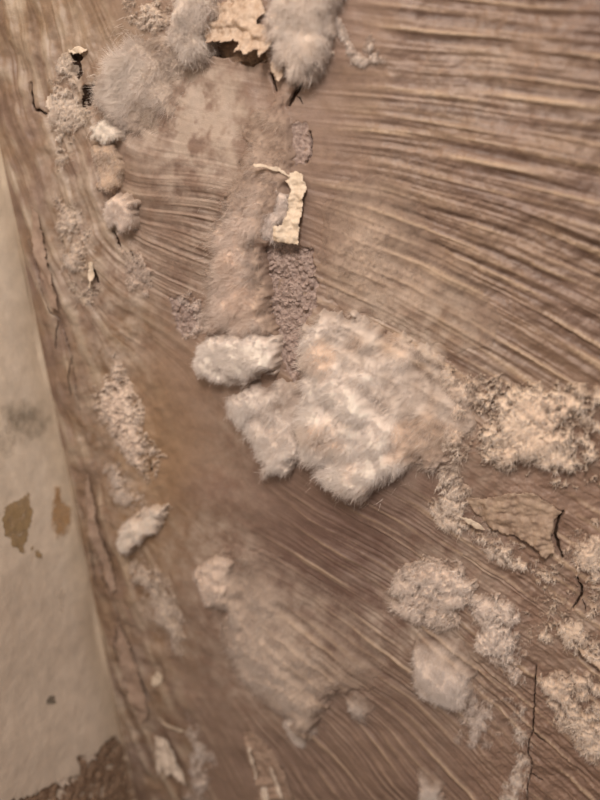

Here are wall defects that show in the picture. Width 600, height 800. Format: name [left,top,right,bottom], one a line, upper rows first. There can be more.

peeling [203,0,284,82]
leakage [46,0,223,312]
flaking render [266,243,320,382]
leakage [177,0,600,800]
leakage [2,493,42,558]
leakage [91,351,186,656]
peeling [460,492,562,559]
crack [551,511,563,558]
crack [573,576,586,610]
flaking render [12,737,135,800]
crack [527,666,545,799]